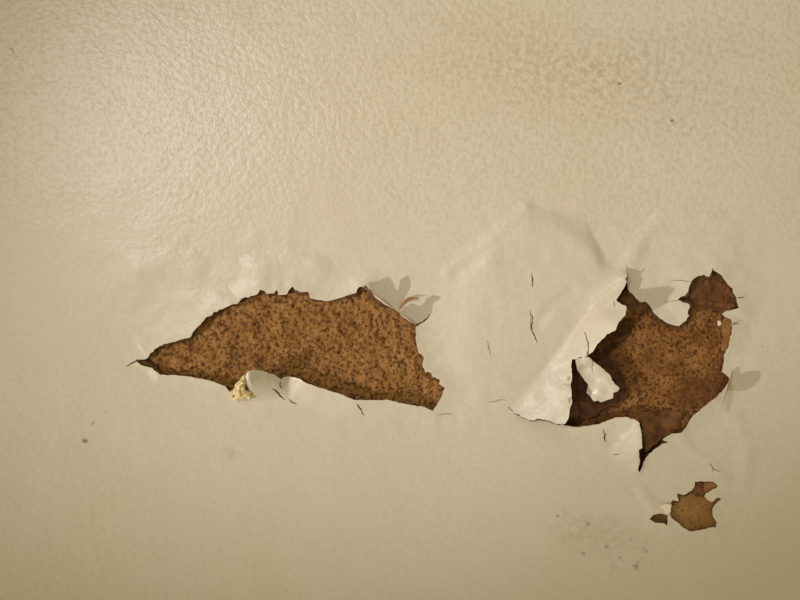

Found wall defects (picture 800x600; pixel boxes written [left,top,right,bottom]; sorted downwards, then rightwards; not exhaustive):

peeling [96,285,445,446]
peeling [480,269,795,568]